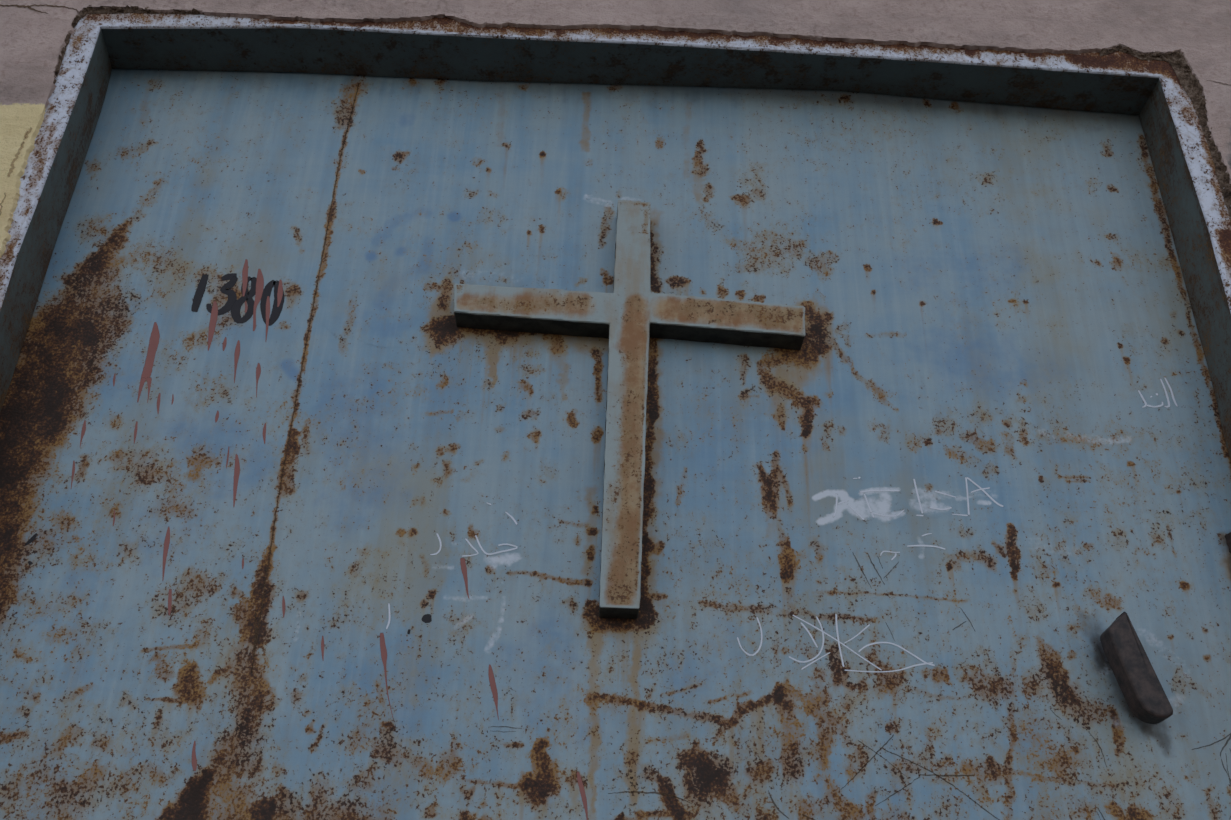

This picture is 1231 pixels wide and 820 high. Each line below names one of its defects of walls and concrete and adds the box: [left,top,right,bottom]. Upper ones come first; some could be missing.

crack [0,4,79,14]
rust [0,75,503,820]
rust [55,13,1231,294]
rust [407,132,1231,820]